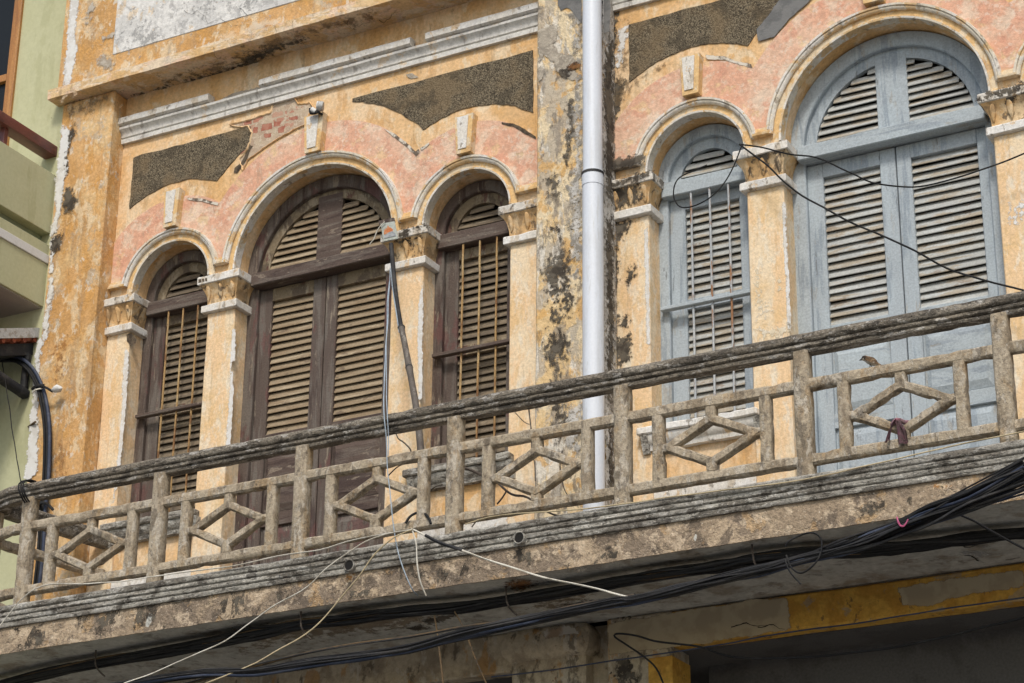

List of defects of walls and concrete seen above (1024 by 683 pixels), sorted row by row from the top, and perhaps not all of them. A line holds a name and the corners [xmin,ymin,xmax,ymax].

peeling [706,55,752,68]
spalling [229,98,314,173]
damp [539,13,583,382]
damp [550,402,583,425]
damp [547,434,581,453]